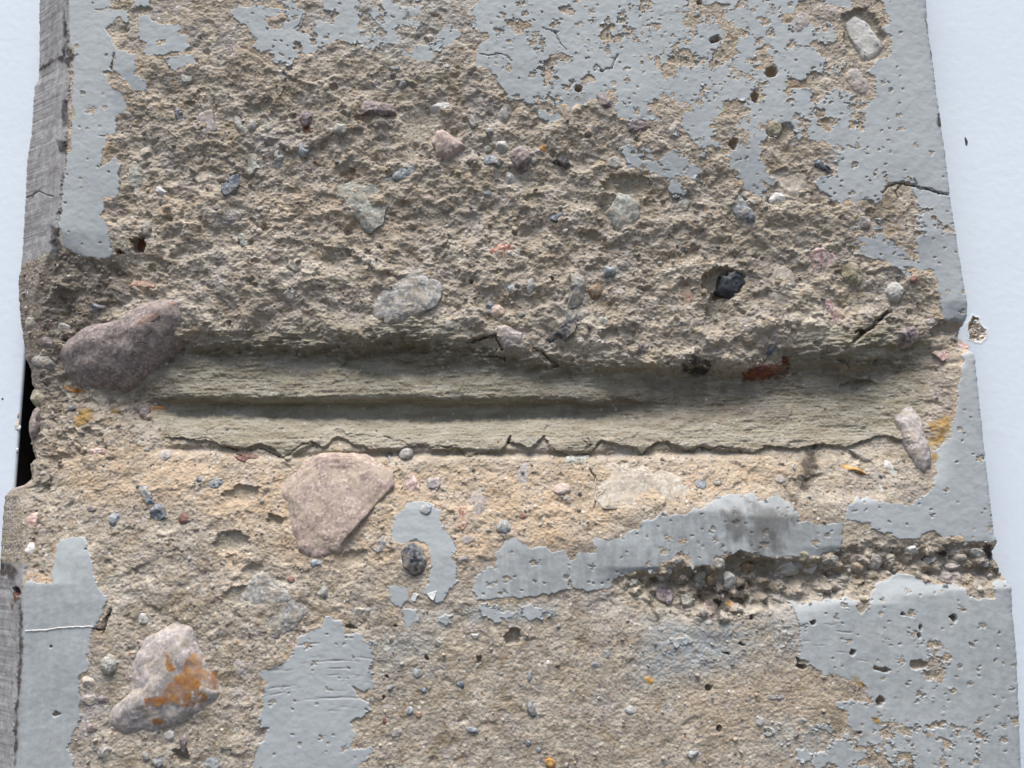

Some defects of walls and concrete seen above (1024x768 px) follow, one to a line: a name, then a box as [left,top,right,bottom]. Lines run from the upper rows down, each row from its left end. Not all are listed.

peeling [133,0,196,72]
peeling [400,20,461,62]
crack [885,181,949,199]
peeling [520,603,546,614]
peeling [666,635,693,648]
peeling [252,616,378,768]
peeling [809,723,833,735]
spalling [880,718,921,746]
spalling [852,742,891,768]
spalling [897,752,914,768]